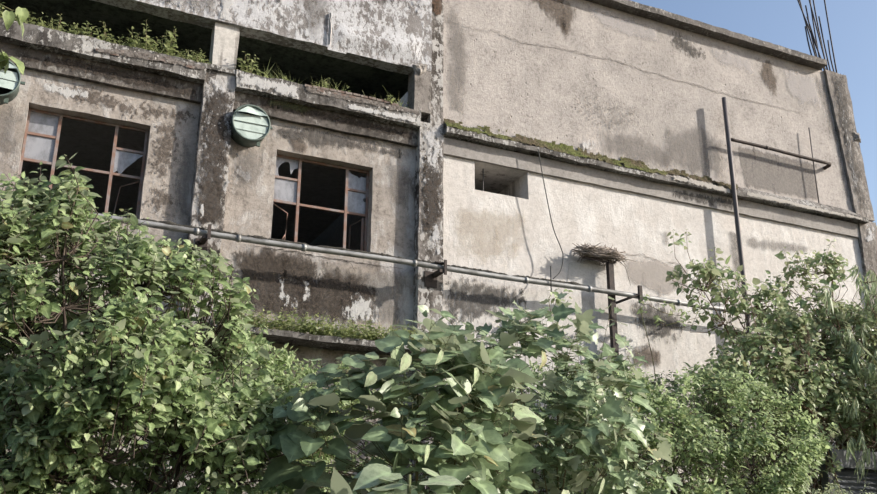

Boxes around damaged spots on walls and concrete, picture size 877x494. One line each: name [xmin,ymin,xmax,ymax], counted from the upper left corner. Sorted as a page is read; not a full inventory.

leakage [534,0,575,35]
flaking render [95,48,206,69]
crack [448,18,816,115]
leakage [670,30,777,93]
peeling [58,79,252,217]
leakage [787,71,867,210]
peeling [422,123,445,255]
leakage [235,248,402,325]
leakage [445,272,526,324]